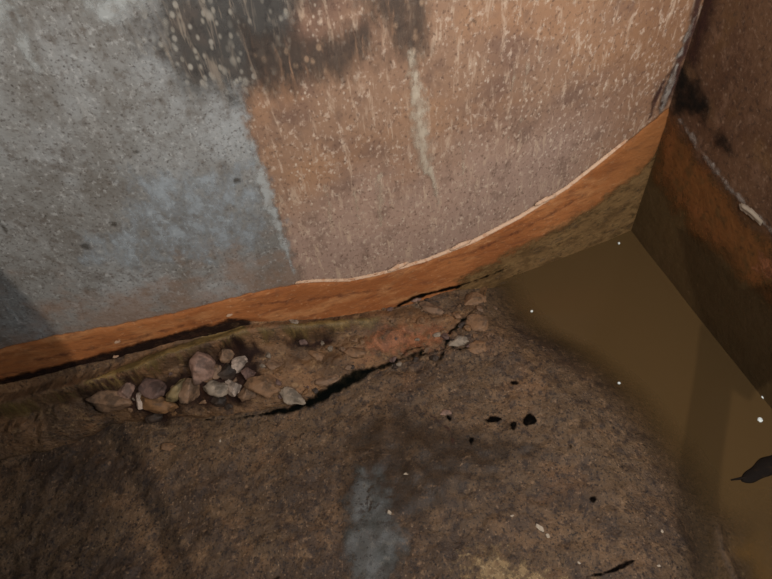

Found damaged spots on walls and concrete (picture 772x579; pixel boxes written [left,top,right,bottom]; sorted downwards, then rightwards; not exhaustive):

damp [157,0,368,91]
damp [374,0,437,195]
damp [674,67,709,147]
corrosion [0,0,772,380]
damp [704,156,772,232]
crack [205,317,469,420]
damp [345,412,509,579]